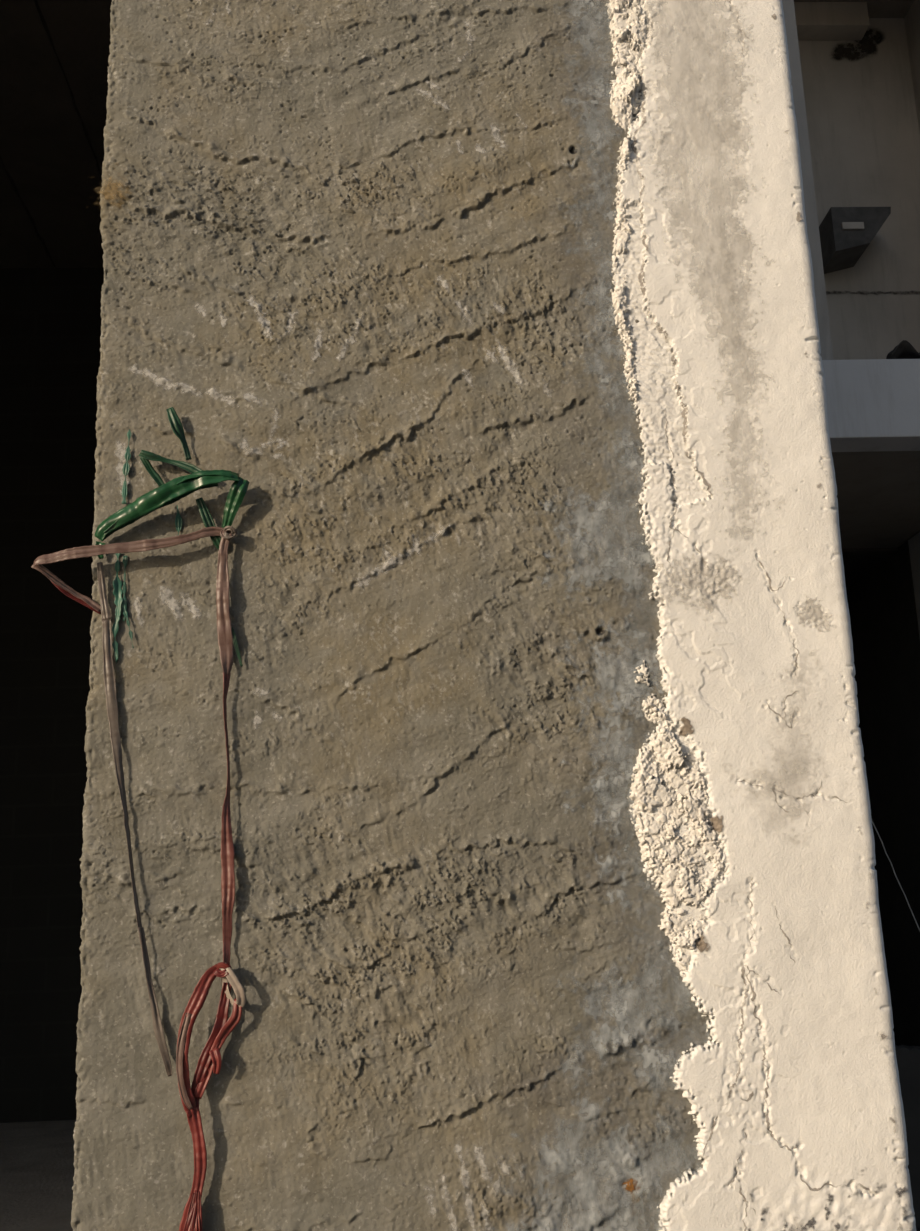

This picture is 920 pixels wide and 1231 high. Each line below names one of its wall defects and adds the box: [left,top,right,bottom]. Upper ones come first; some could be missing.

peeling [607,0,774,512]
peeling [257,306,295,339]
peeling [153,378,260,405]
peeling [378,525,450,572]
peeling [159,586,200,619]
damp [563,614,664,914]
spalling [627,660,724,977]
crack [703,879,833,1231]
damp [508,938,709,1231]
peeling [474,1146,524,1193]
peeling [427,1176,491,1231]
damp [783,1194,848,1231]